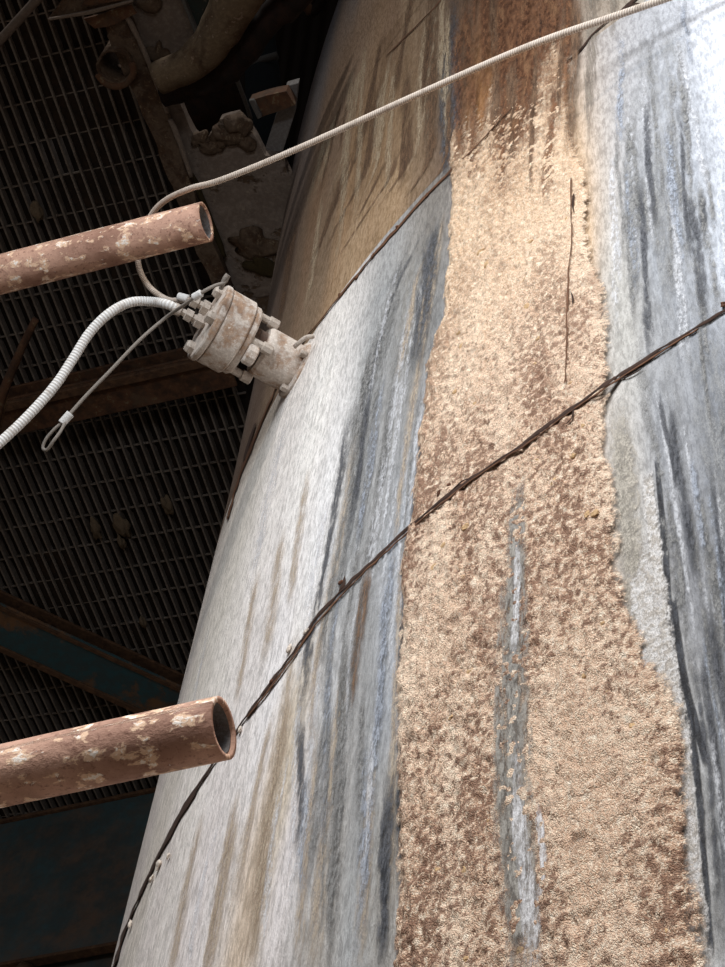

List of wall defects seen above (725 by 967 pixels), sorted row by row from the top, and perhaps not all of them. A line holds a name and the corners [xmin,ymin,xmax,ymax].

water stain [279,226,442,950]
water stain [309,0,460,290]
rust [452,0,581,195]
spalling [393,40,712,967]
water stain [585,0,598,120]
water stain [610,9,725,961]